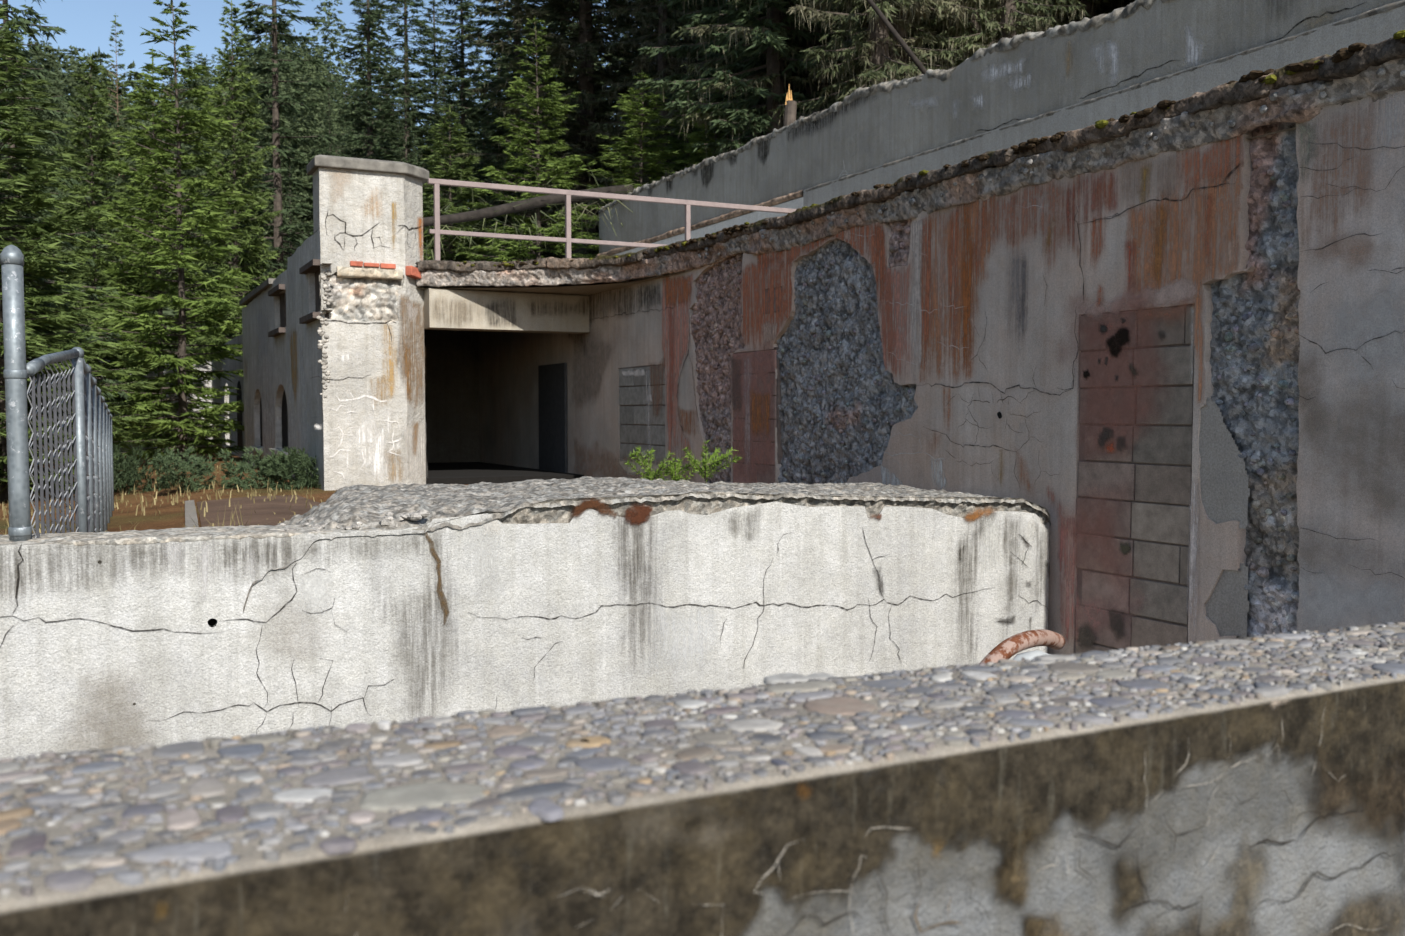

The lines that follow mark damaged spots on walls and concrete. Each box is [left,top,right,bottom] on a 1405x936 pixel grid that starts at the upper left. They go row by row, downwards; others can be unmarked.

crack [1301,143,1405,199]
corrosion [741,224,887,347]
corrosion [920,172,1117,418]
crack [1305,233,1378,251]
spalling [316,58,1405,640]
crack [1298,331,1400,388]
corrosion [573,498,653,524]
crack [0,546,394,729]
crack [426,534,449,623]
crack [491,531,967,677]
crack [997,534,1050,623]